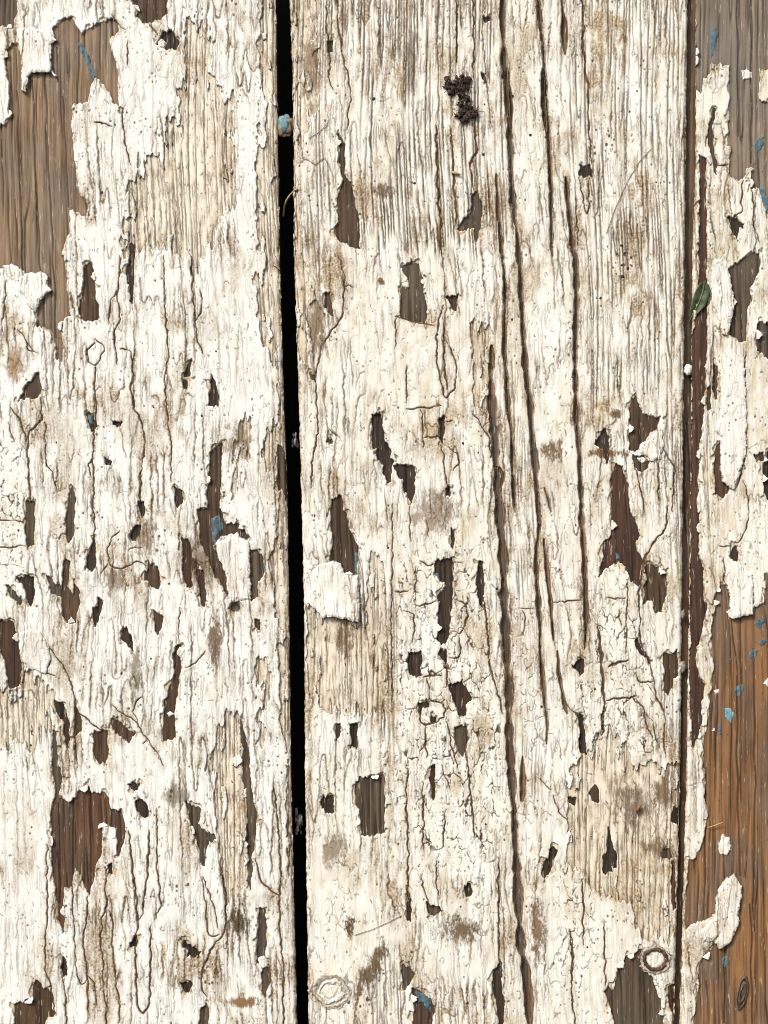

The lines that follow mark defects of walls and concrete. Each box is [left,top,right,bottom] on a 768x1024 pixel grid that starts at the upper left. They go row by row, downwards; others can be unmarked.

peeling [0,0,119,362]
peeling [0,619,136,933]
crack [44,815,162,1024]
crack [87,256,173,571]
crack [201,870,227,997]
peeling [181,386,293,902]
crack [255,787,285,1024]
peeling [306,495,388,749]
peeling [372,413,416,503]
crack [395,305,492,488]
crack [390,504,503,907]
peeling [541,0,768,1024]